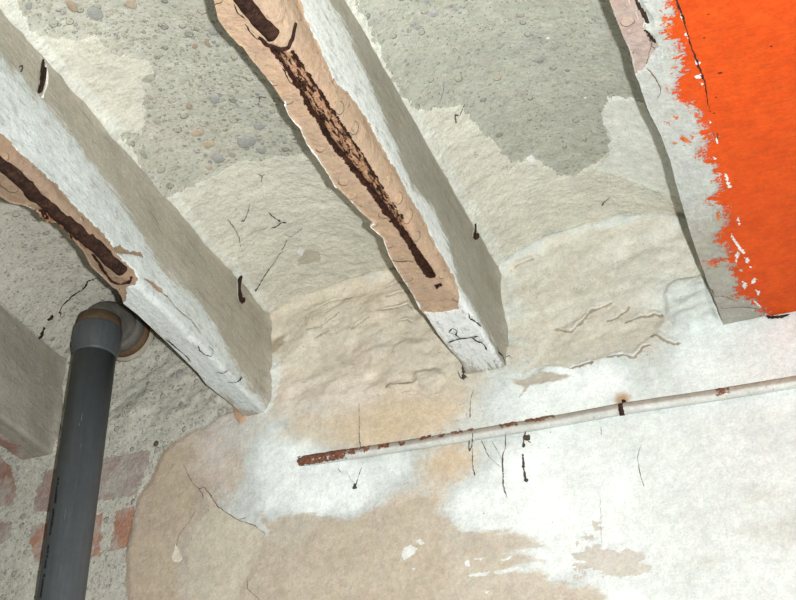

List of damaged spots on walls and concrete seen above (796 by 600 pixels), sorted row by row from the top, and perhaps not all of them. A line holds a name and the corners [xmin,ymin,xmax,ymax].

flaking render [17,0,460,321]
flaking render [0,134,143,600]
damp [125,429,212,600]
flaking render [85,332,286,600]
rust [297,441,405,466]
damp [254,380,483,462]
damp [316,438,498,495]
rust [499,415,555,428]
rust [607,384,640,405]
damp [672,467,796,587]